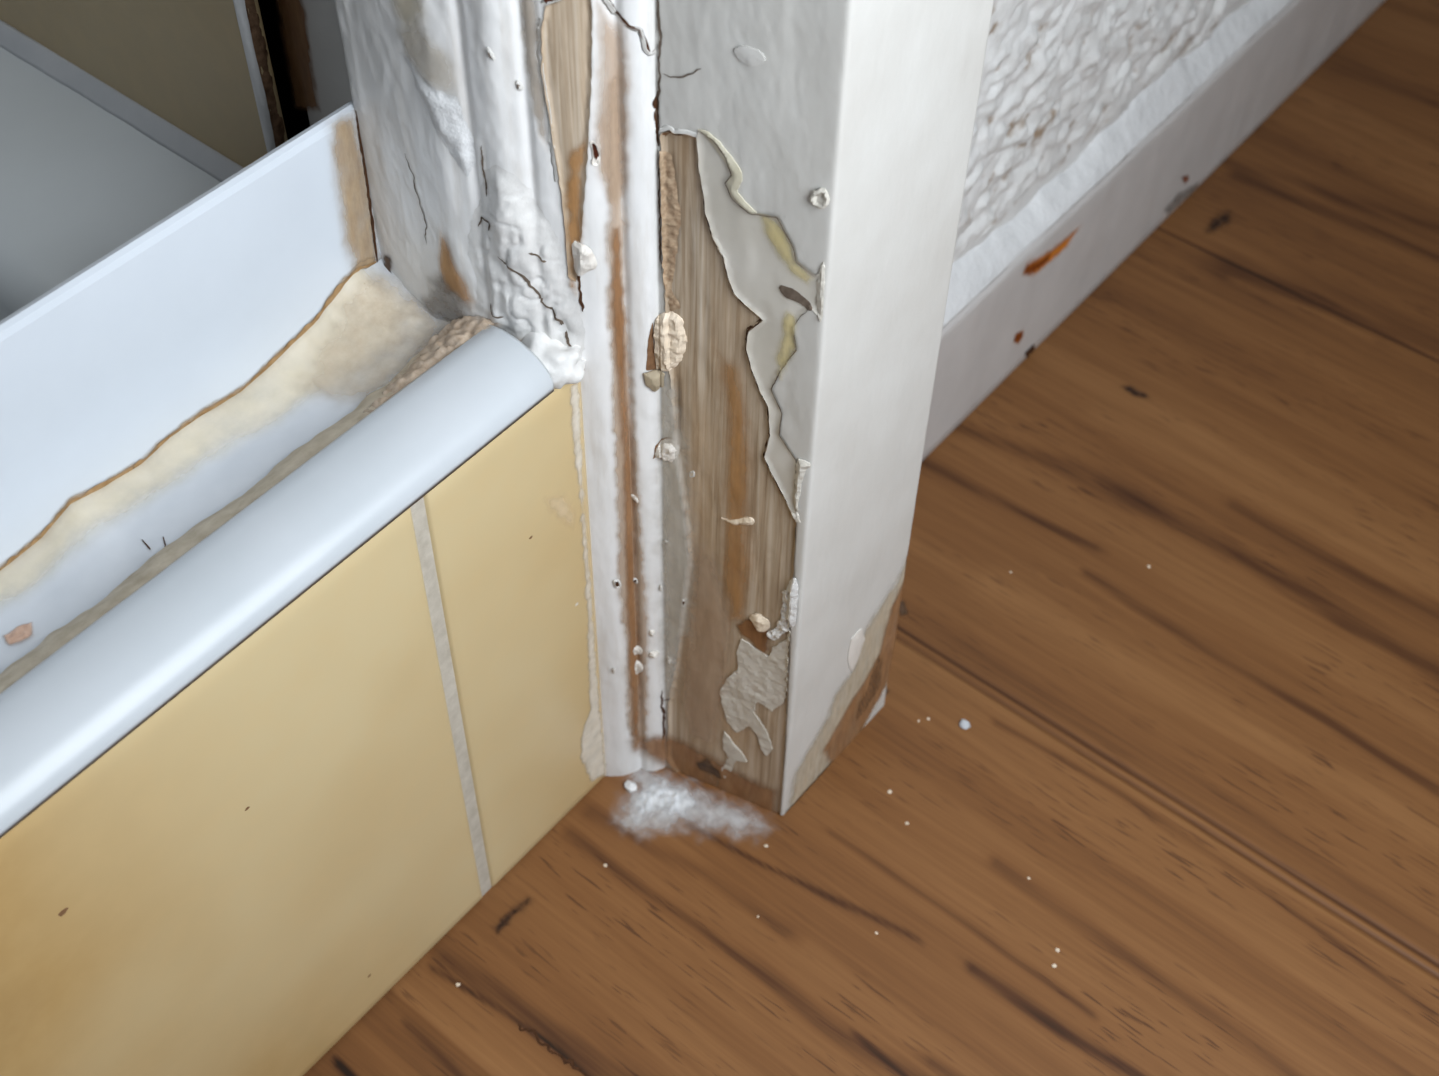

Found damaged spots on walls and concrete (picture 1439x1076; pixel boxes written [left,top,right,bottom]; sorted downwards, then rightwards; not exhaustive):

damp [0,110,469,598]
peeling [516,0,626,282]
crack [602,0,700,274]
peeling [633,125,825,813]
damp [608,80,906,814]
peeling [810,188,830,209]
corrosion [1024,230,1077,275]